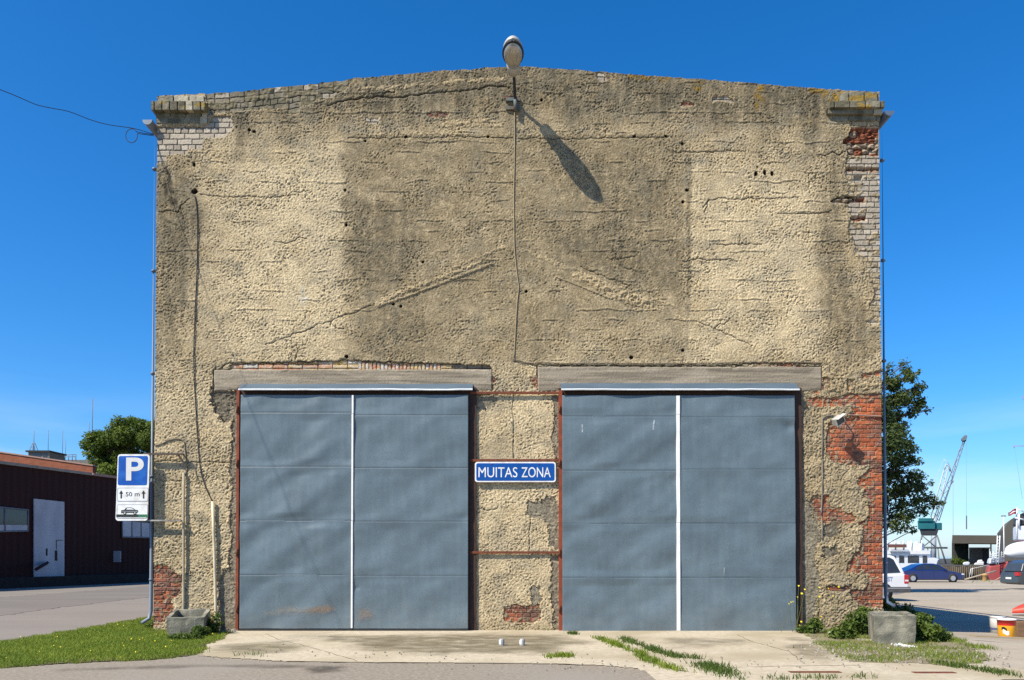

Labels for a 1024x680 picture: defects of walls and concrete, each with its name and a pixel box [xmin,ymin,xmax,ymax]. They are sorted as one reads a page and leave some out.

flaking render [157,79,354,164]
flaking render [832,121,881,326]
crack [222,299,455,368]
flaking render [153,562,182,626]
flaking render [503,496,559,630]
flaking render [801,370,883,627]